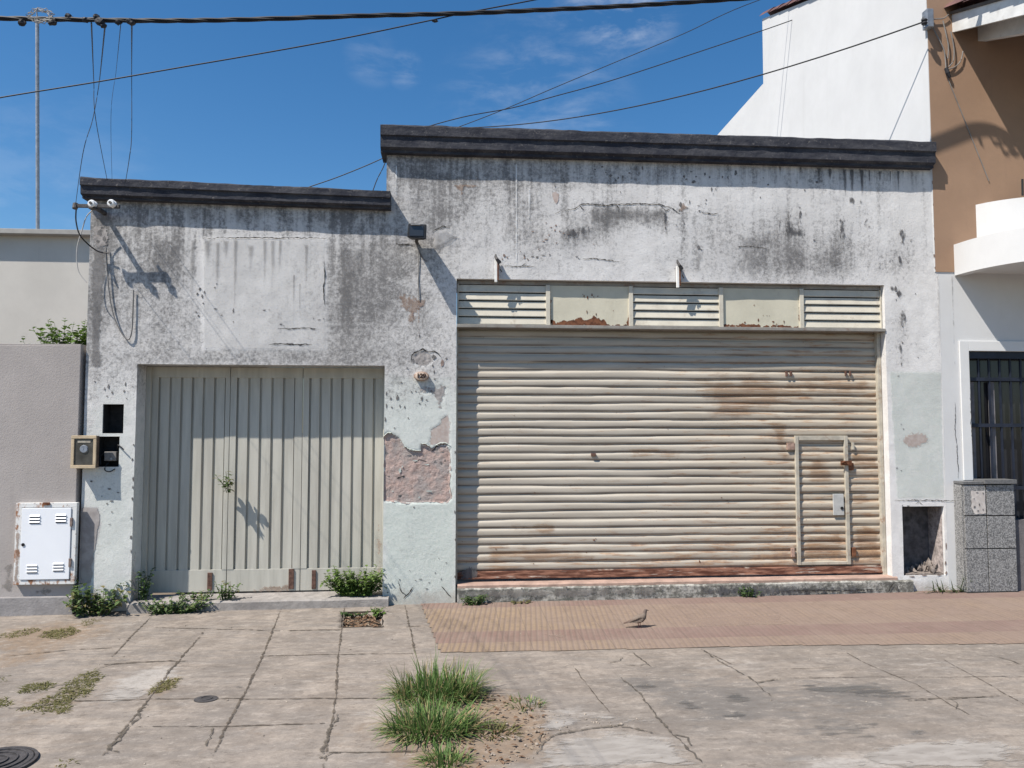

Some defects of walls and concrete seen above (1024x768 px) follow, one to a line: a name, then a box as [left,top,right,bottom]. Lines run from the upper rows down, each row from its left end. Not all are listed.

leakage [818,168,904,204]
crack [555,203,718,214]
leakage [91,247,105,367]
rust [550,294,629,326]
flaking render [383,348,456,513]
peeling [901,424,928,448]